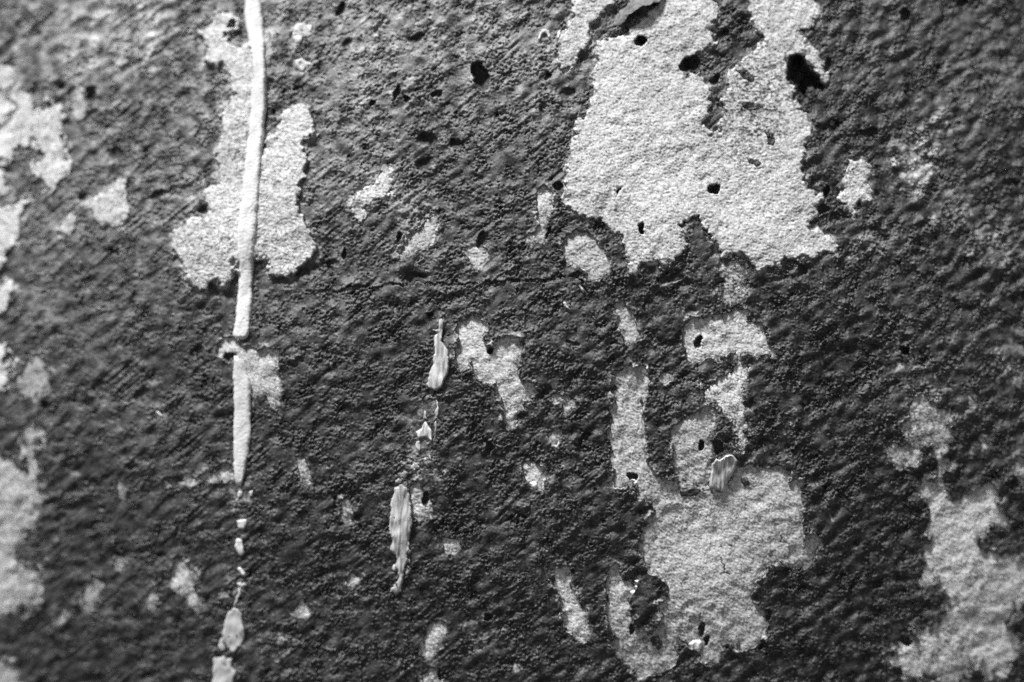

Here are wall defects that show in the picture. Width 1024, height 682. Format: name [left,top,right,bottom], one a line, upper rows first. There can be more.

peeling [0,65,97,314]
peeling [170,13,255,291]
peeling [253,86,318,278]
peeling [292,58,311,72]
peeling [291,23,313,46]
peeling [0,342,54,615]
peeling [216,337,283,408]
peeling [388,312,576,596]
peeling [522,0,874,678]
peeling [883,390,1024,682]